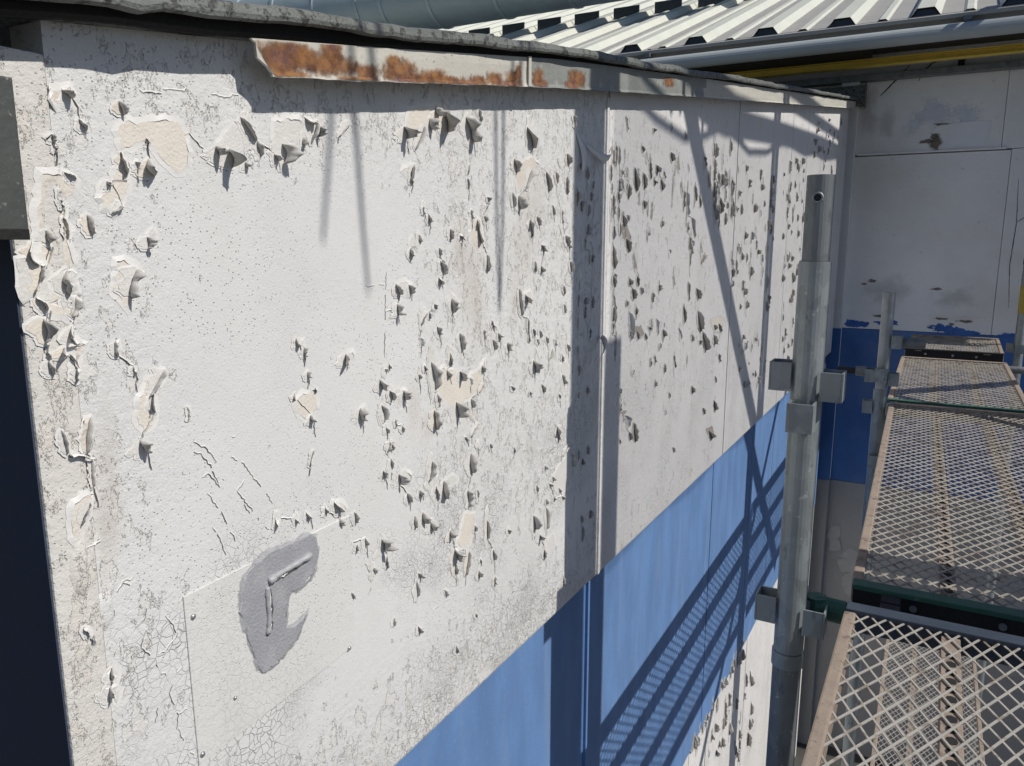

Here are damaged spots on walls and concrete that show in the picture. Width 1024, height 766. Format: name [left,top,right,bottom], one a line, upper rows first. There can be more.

peeling [48,81,90,134]
rust [258,41,548,87]
rust [565,70,585,88]
peeling [13,98,352,386]
peeling [509,114,842,405]
peeling [106,338,168,470]
peeling [351,101,513,598]
peeling [54,414,100,547]
crack [194,435,273,555]
peeling [529,424,591,560]
crack [113,577,195,754]
peeling [691,637,755,764]